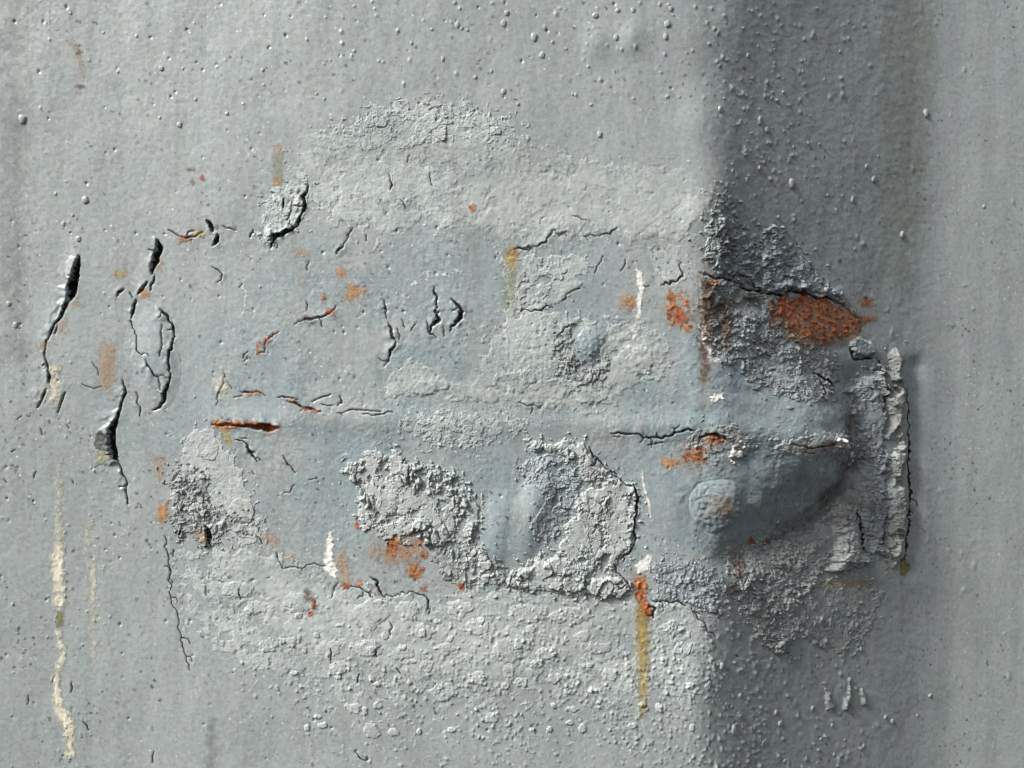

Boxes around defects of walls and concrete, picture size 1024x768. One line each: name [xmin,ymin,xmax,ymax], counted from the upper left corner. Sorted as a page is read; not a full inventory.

crack [16,185,317,504]
crack [336,229,367,255]
crack [378,287,464,367]
crack [515,216,626,336]
corrosion [666,280,731,380]
corrosion [767,292,876,347]
corrosion [211,420,275,446]
peeling [150,86,923,767]
damp [49,480,75,757]
crack [163,526,212,670]
corrosion [371,530,428,592]
corrosion [634,575,652,708]